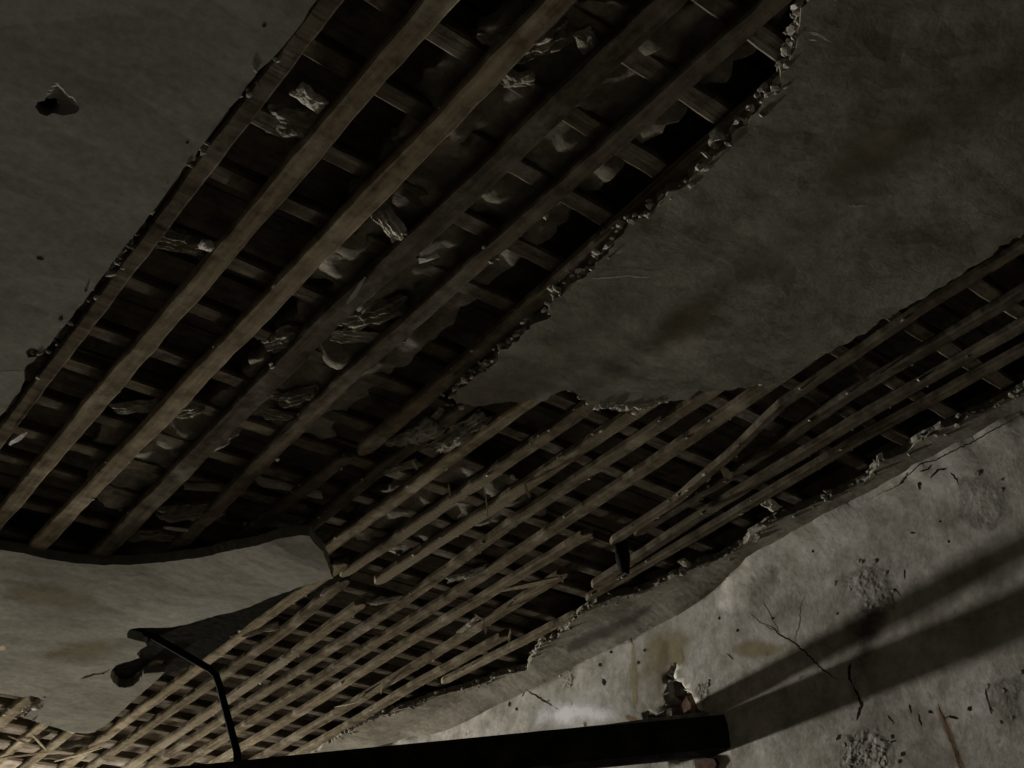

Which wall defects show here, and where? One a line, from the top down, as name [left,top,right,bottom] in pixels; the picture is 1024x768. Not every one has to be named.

spalling [40,83,79,115]
spalling [676,0,806,190]
spalling [541,193,673,314]
flaking render [567,391,669,415]
spalling [812,388,1021,508]
crack [871,417,1017,499]
spalling [335,509,798,740]
crack [752,599,863,720]
flaking render [833,559,898,612]
flaking render [834,728,902,768]